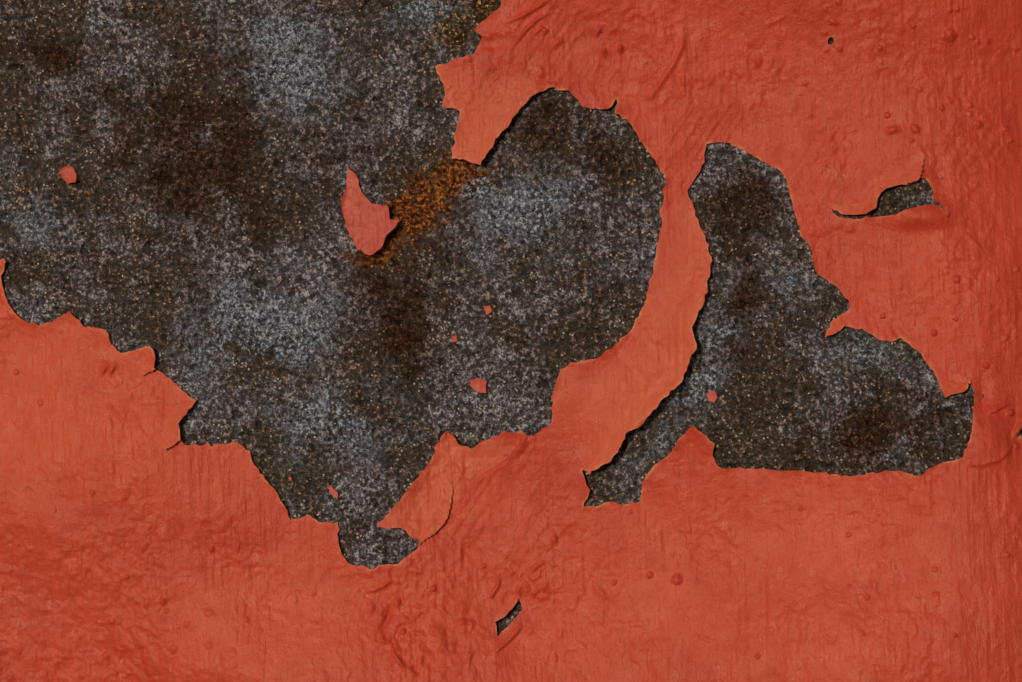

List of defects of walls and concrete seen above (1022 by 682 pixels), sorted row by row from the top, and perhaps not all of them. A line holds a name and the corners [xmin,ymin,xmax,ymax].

corrosion [364,159,481,260]
peeling [0,0,974,569]
peeling [496,601,522,636]